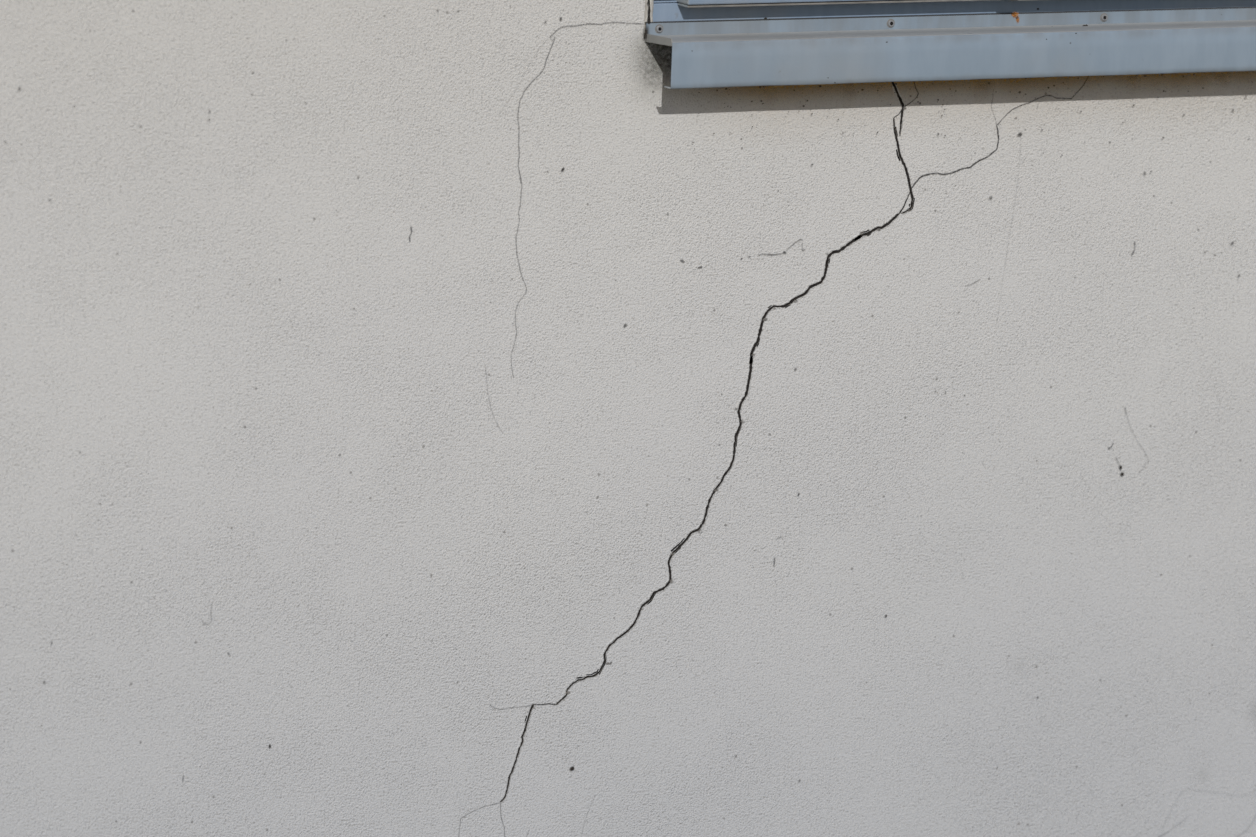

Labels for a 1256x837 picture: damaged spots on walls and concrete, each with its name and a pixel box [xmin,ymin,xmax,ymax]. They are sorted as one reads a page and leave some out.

crack [499,78,1088,804]